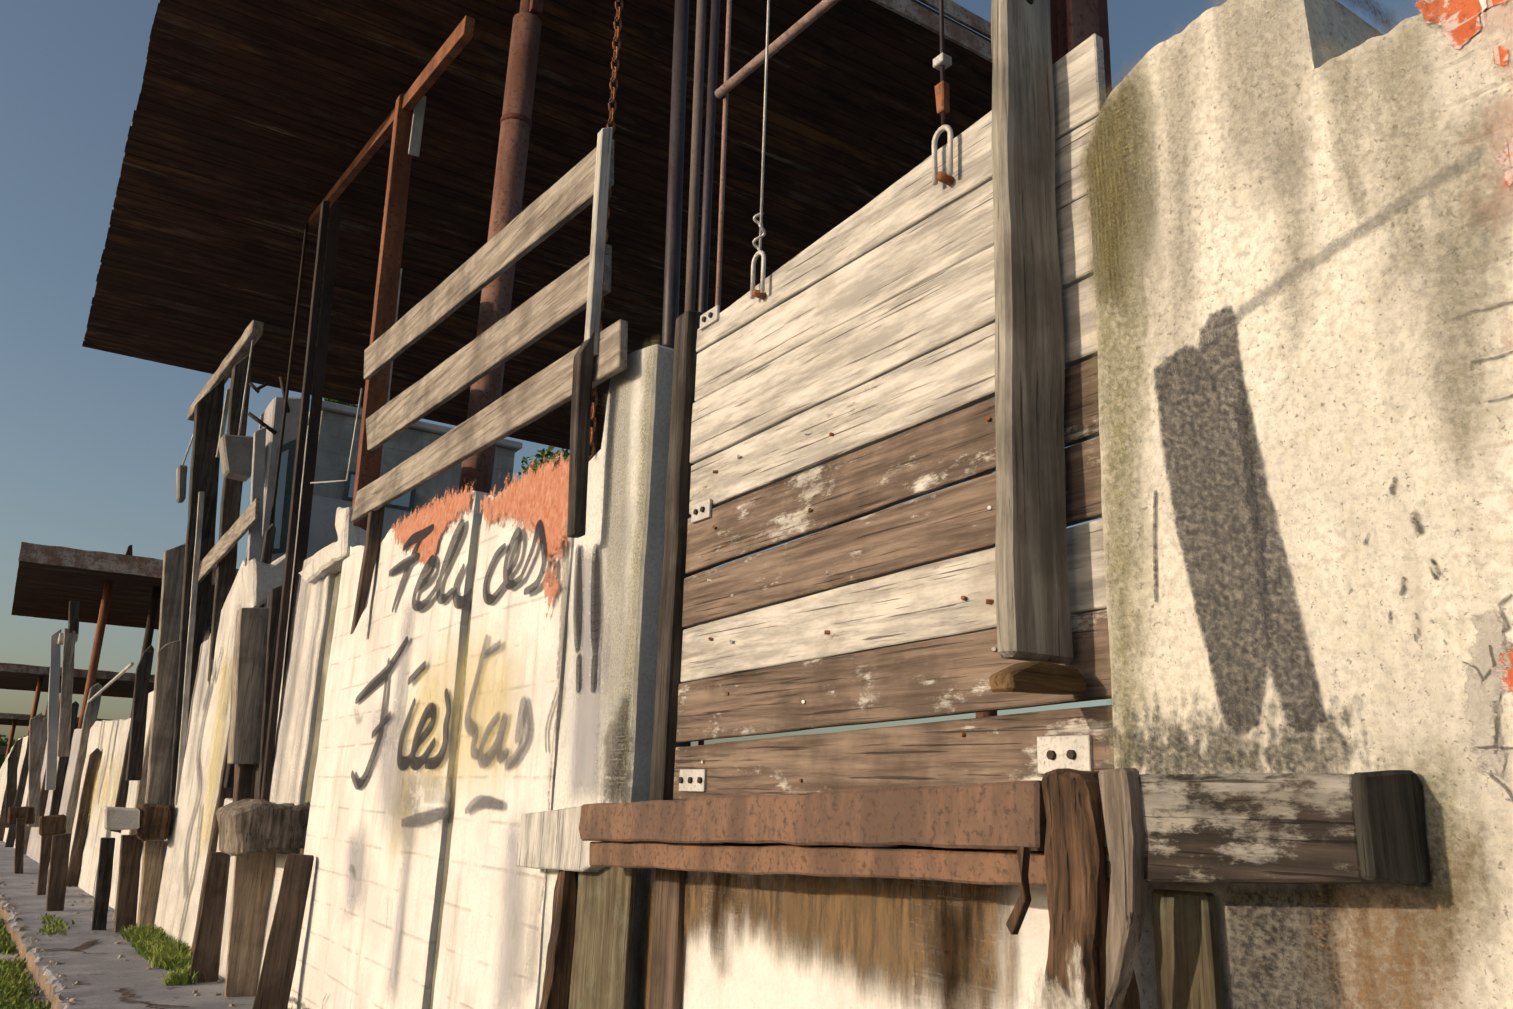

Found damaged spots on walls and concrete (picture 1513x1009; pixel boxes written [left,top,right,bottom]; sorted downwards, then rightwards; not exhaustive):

peeling [1415,0,1508,49]
peeling [1493,45,1509,66]
peeling [1495,137,1513,187]
crack [1462,594,1513,802]
spalling [1463,606,1513,778]
leakage [637,871,655,1009]
leakage [683,871,1014,1009]